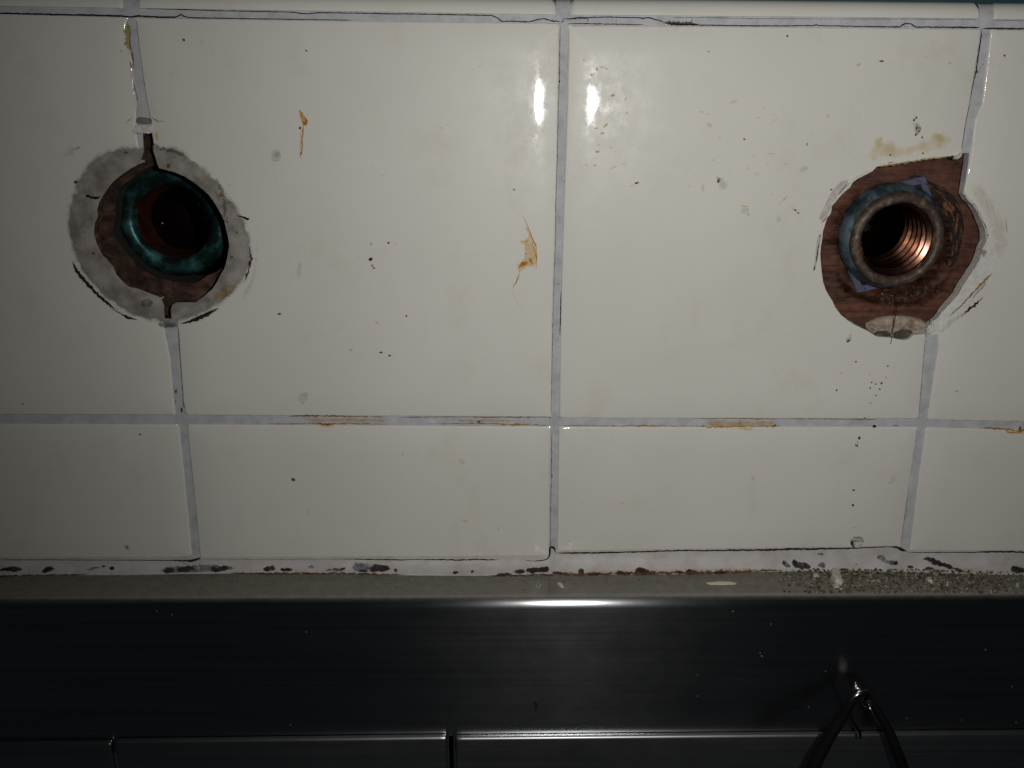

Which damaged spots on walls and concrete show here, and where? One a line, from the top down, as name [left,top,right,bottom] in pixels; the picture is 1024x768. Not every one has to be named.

spalling [813,171,869,271]
spalling [193,254,228,275]
spalling [844,175,996,339]
damp [359,563,397,572]
damp [497,566,601,576]
damp [617,567,656,575]
damp [782,554,824,569]
damp [891,557,964,572]